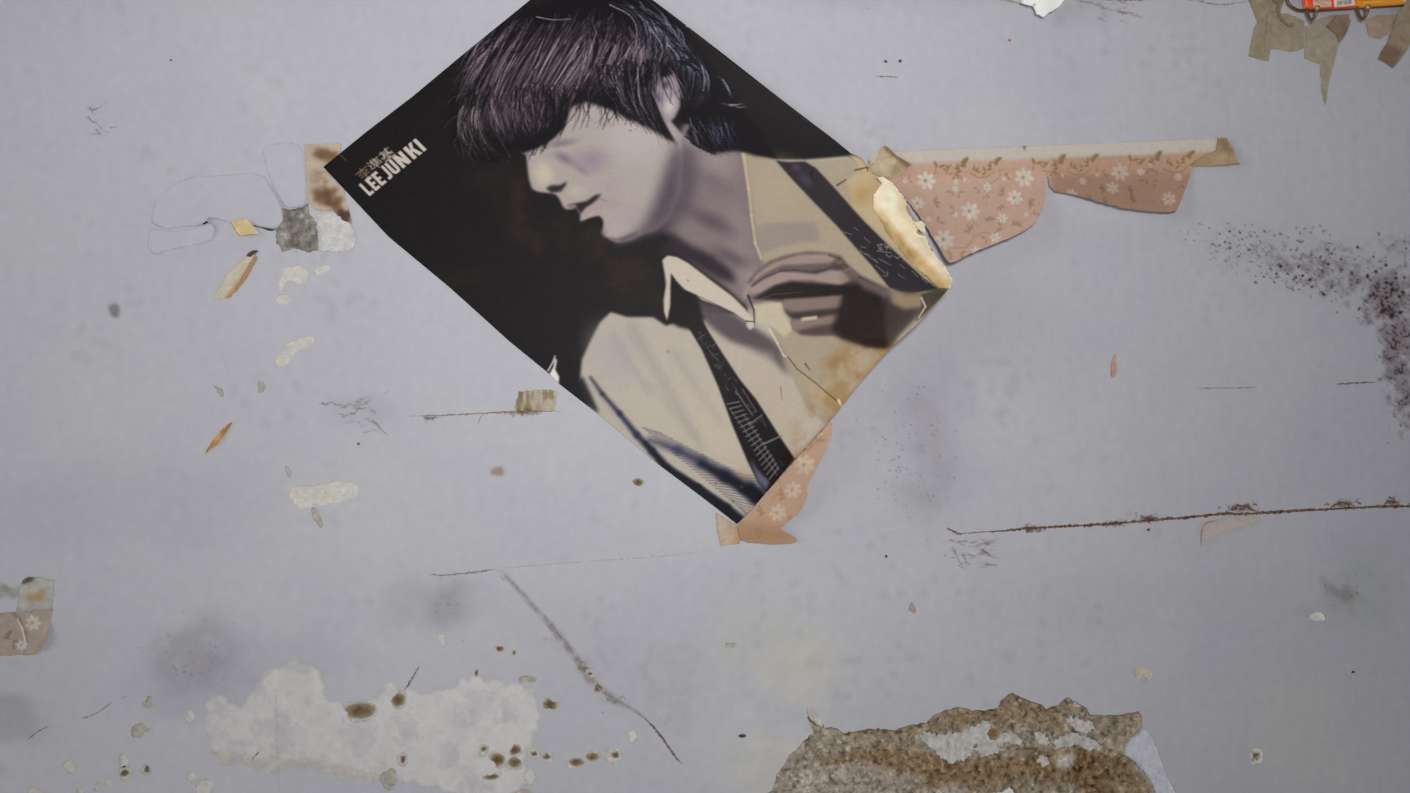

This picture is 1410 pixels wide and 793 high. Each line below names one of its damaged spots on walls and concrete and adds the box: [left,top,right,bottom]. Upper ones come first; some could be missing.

peeling [148,142,356,304]
damp [1208,227,1410,426]
crack [947,496,1410,542]
spalling [343,690,407,723]
spalling [379,752,409,791]
spalling [542,698,559,714]
crack [429,550,708,763]
spalling [769,693,1175,793]